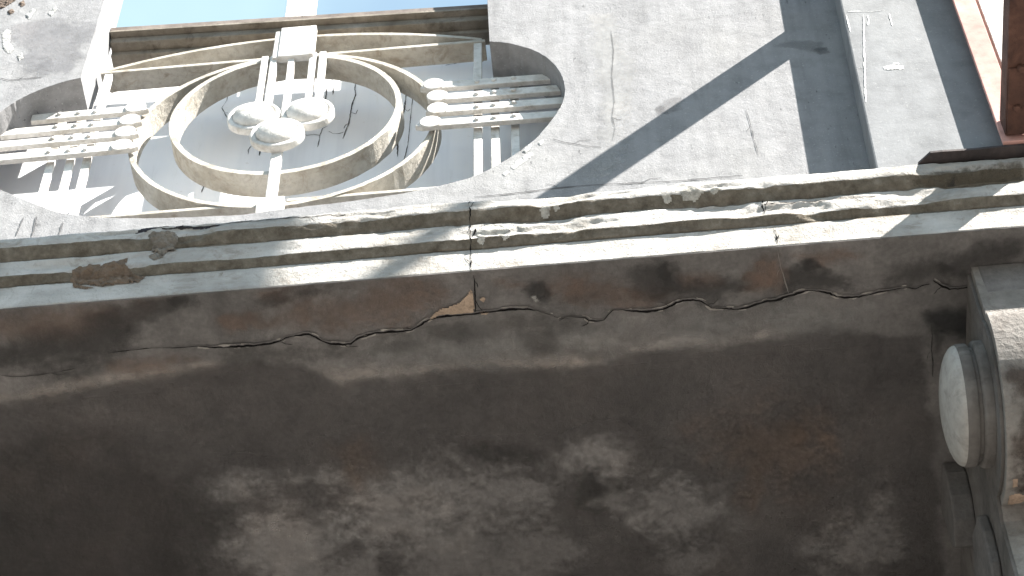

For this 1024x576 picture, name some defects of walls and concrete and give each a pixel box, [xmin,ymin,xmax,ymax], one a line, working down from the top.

crack [311,80,358,147]
crack [15,216,63,237]
spalling [135,224,220,260]
spalling [70,258,145,289]
crack [162,175,967,349]
peeling [431,290,488,319]
water stain [926,310,967,336]
water stain [0,326,941,576]